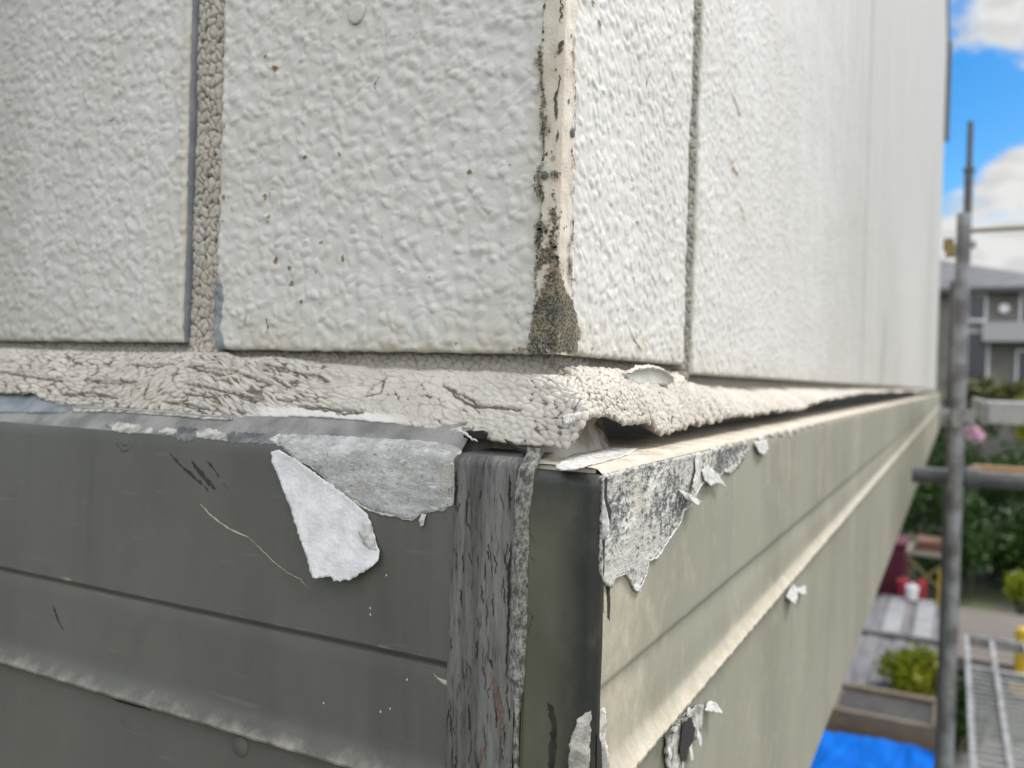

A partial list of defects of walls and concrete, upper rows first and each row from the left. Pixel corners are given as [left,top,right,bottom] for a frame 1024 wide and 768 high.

crack [0,0,734,446]
damp [513,22,582,356]
peeling [268,433,462,582]
peeling [598,421,824,593]
peeling [786,582,806,606]
peeling [568,707,610,768]
peeling [664,701,723,768]